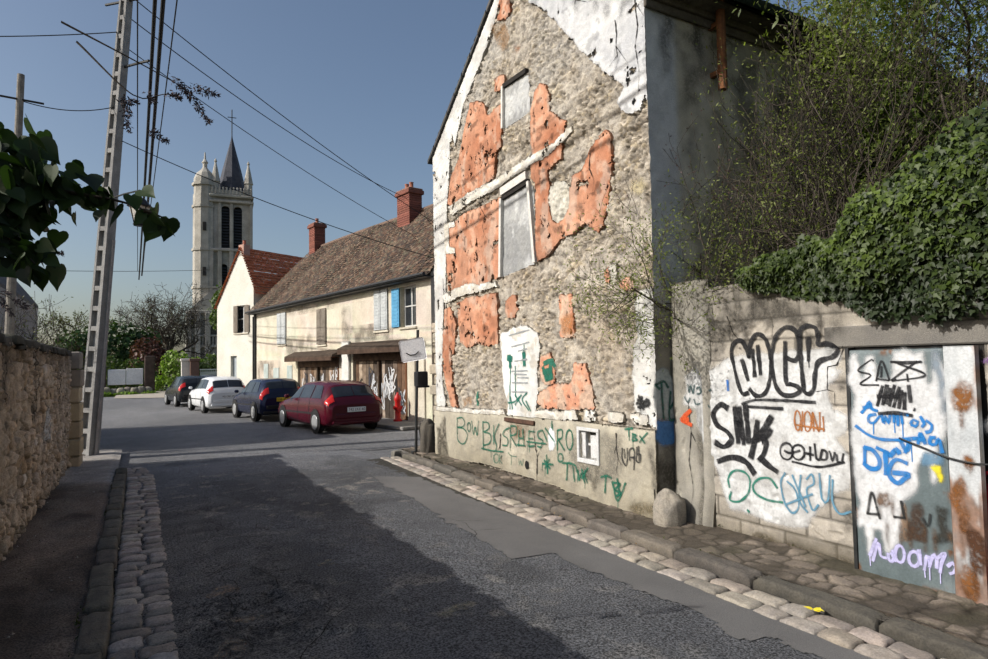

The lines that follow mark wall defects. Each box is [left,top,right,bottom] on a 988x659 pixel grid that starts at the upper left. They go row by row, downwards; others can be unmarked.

spalling [432,0,658,429]
rust [952,386,973,424]
rust [877,478,987,601]